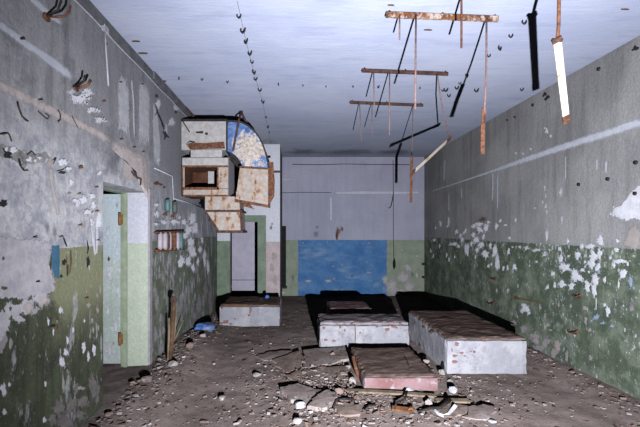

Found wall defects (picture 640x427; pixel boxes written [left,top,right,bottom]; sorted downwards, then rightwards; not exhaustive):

peeling [67,88,107,123]
peeling [0,236,60,353]
spalling [0,145,110,255]
peeling [43,328,100,427]
peeling [152,203,215,353]
peeling [449,219,517,271]
peeling [508,303,568,361]
peeling [507,229,614,332]
peeling [610,186,640,289]